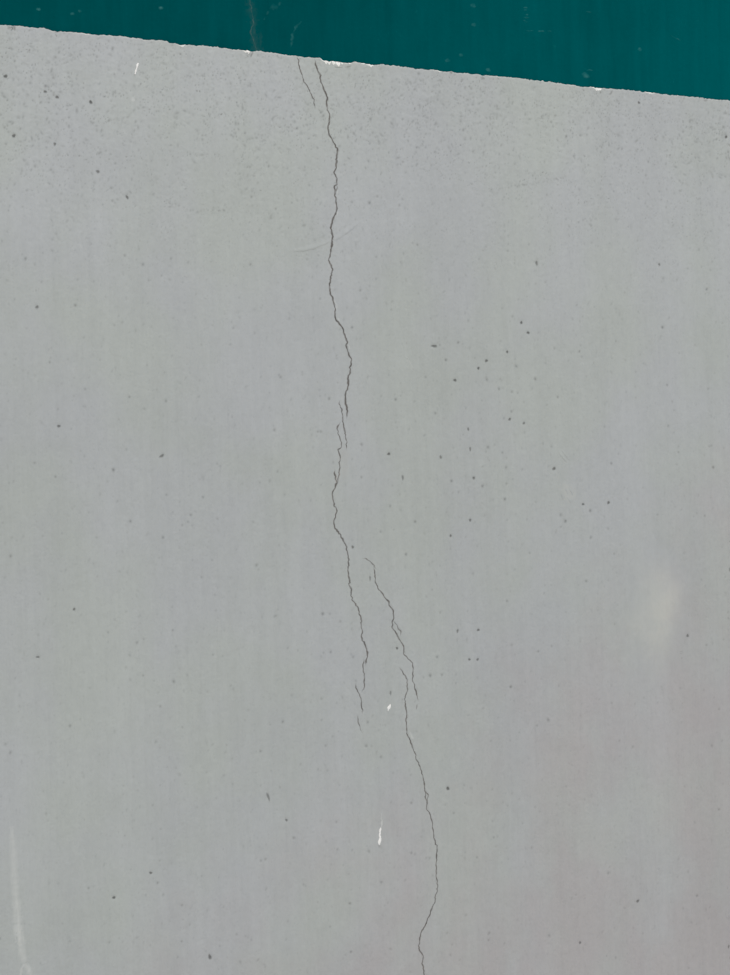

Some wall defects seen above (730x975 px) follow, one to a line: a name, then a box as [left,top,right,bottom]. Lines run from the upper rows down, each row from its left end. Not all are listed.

crack [297,57,438,975]